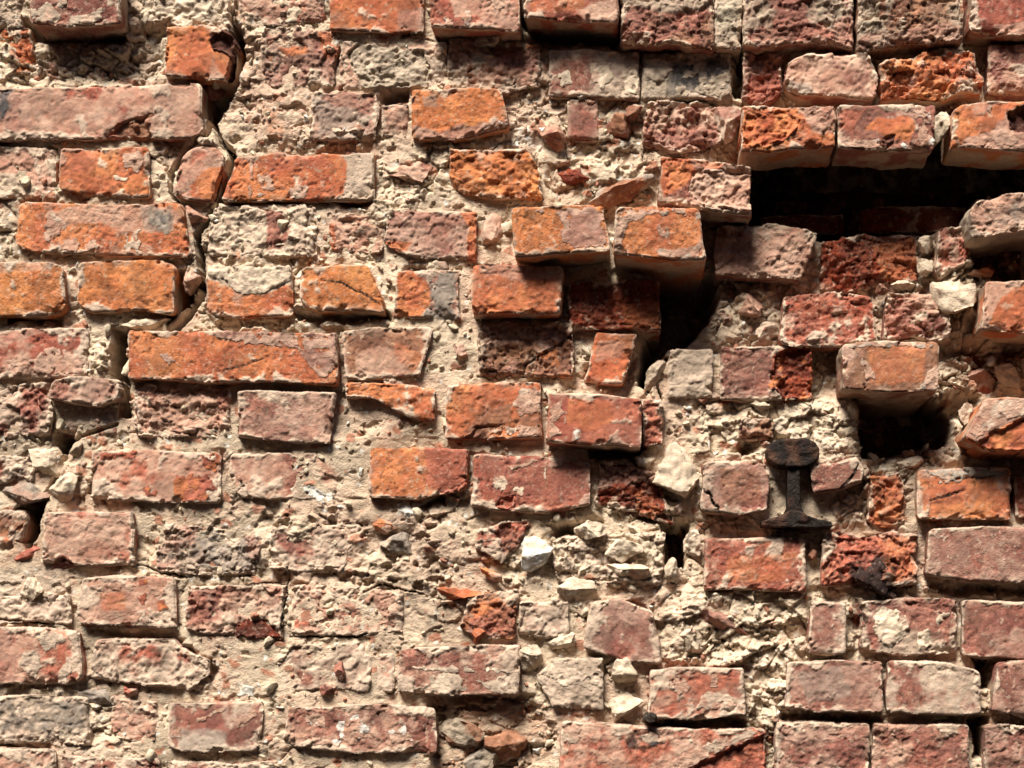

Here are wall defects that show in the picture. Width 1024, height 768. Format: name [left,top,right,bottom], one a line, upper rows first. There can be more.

crack [217,132,237,161]
spalling [449,148,996,379]
peeling [919,367,939,390]
hole [857,426,937,460]
rust [839,555,900,660]